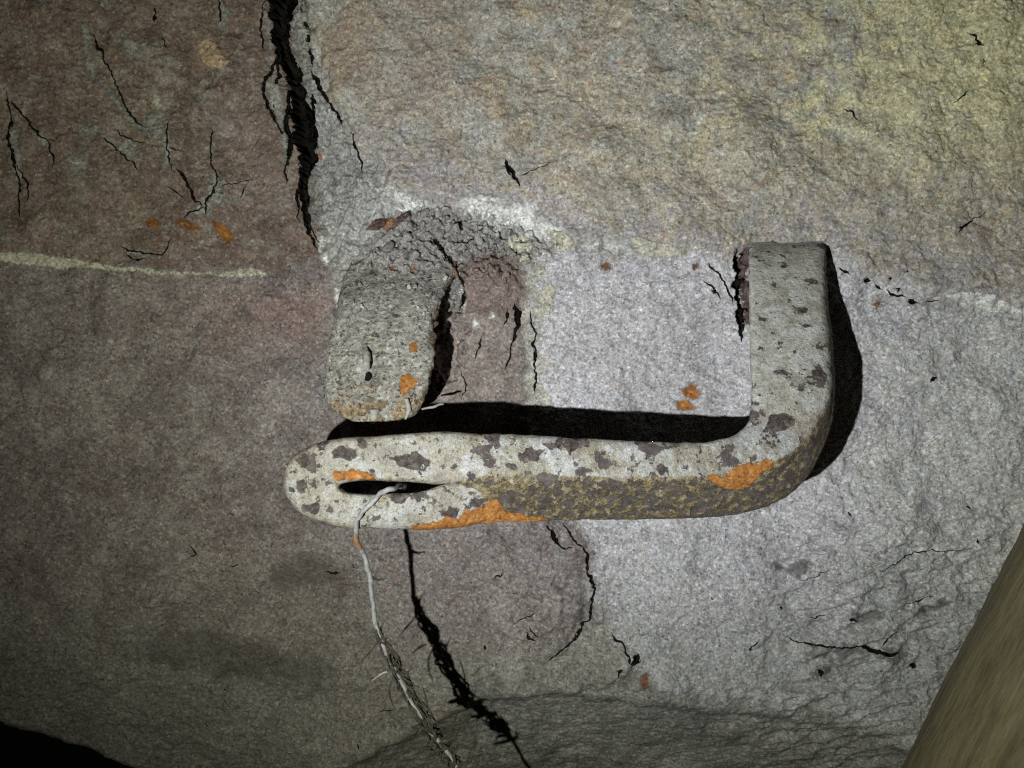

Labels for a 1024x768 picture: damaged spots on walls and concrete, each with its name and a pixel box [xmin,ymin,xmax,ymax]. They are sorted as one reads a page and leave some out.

crack [6,94,57,218]
crack [90,33,251,261]
crack [259,0,363,251]
crack [705,257,745,342]
rust [398,374,418,395]
crack [461,303,537,401]
rust [677,383,700,411]
rust [296,439,367,515]
rust [439,498,484,519]
crack [512,524,596,662]
crack [612,635,641,678]